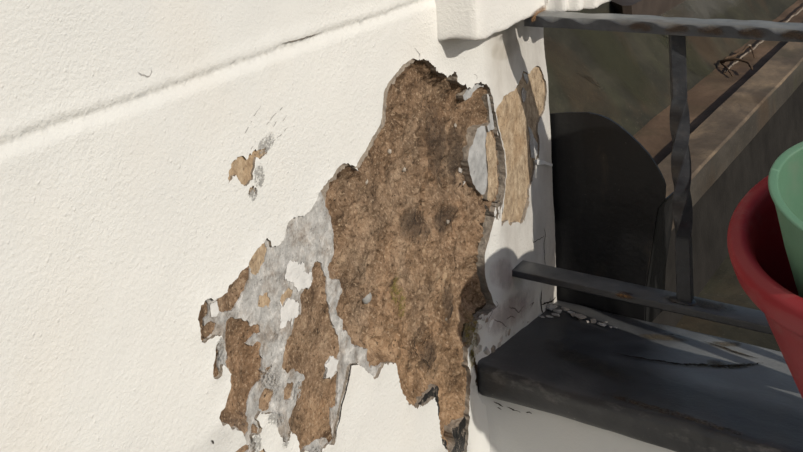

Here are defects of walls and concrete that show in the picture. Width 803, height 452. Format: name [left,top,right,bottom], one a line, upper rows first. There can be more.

flaking render [198,59,553,452]
crack [613,341,758,368]